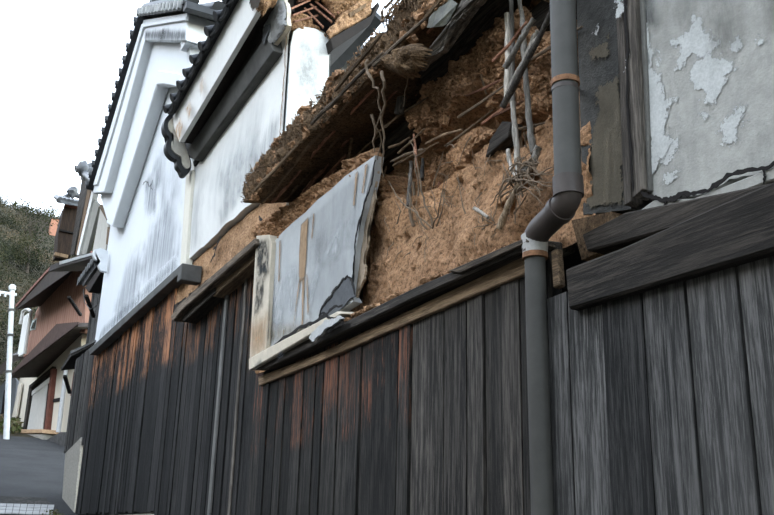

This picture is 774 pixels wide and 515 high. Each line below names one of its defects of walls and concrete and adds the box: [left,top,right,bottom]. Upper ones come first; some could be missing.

flaking render [262,0,292,46]
flaking render [614,0,627,18]
flaking render [646,23,681,185]
flaking render [669,15,743,121]
spalling [309,163,380,342]